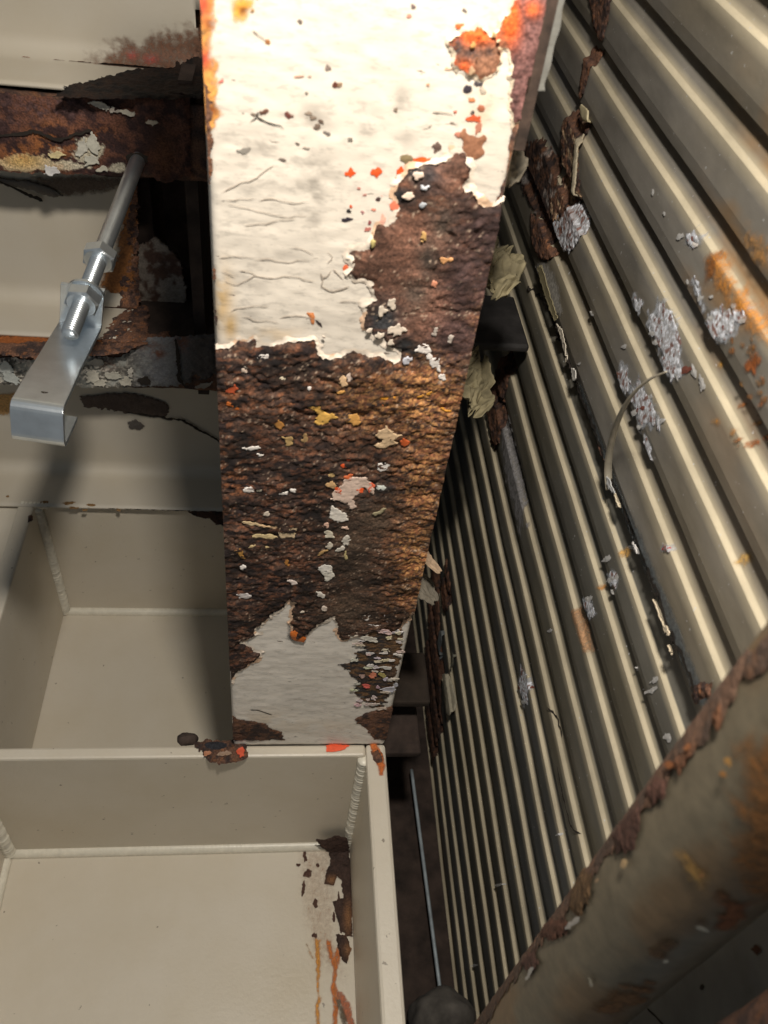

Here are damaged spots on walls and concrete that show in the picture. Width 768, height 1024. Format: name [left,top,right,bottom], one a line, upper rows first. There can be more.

corrosion [0,0,220,356]
crack [223,165,308,226]
peeling [285,111,331,136]
peeling [342,167,400,231]
peeling [395,142,442,178]
peeling [453,81,487,159]
crack [221,248,358,323]
corrosion [0,335,49,360]
corrosion [135,0,611,775]
peeling [338,613,405,711]
corrosion [474,634,768,1024]
corrosion [296,835,354,1024]